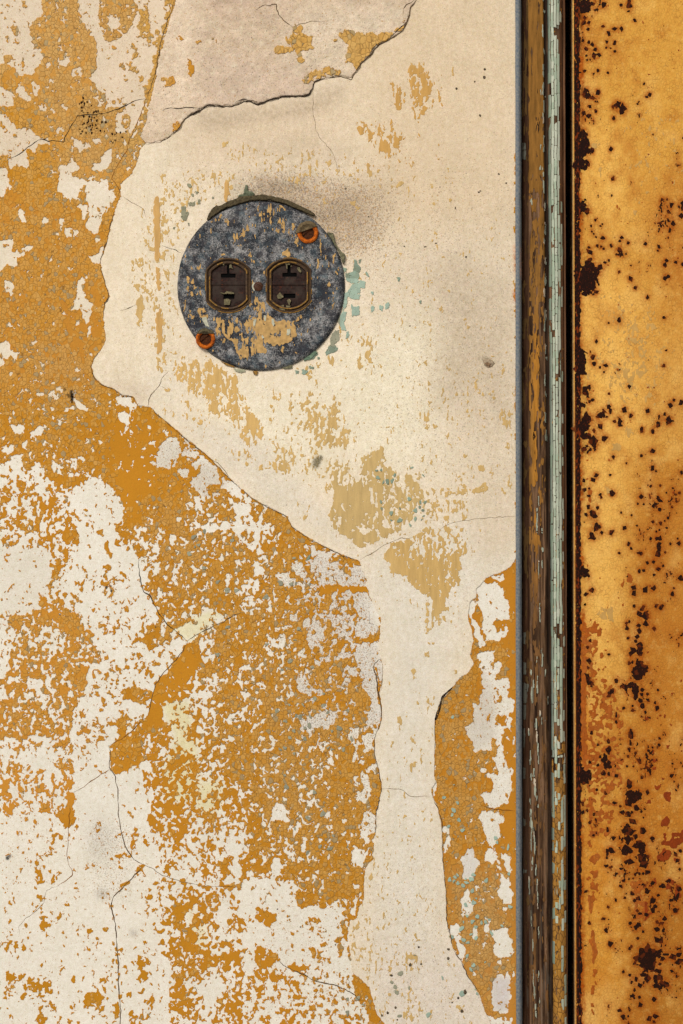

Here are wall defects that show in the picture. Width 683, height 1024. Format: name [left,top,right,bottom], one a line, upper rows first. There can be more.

crack [3,0,415,318]
crack [90,354,408,561]
peeling [0,0,516,1024]
peeling [389,0,567,1024]
rust [571,0,683,1024]
crack [19,557,239,1024]
crack [280,962,360,1000]
crack [369,612,479,992]